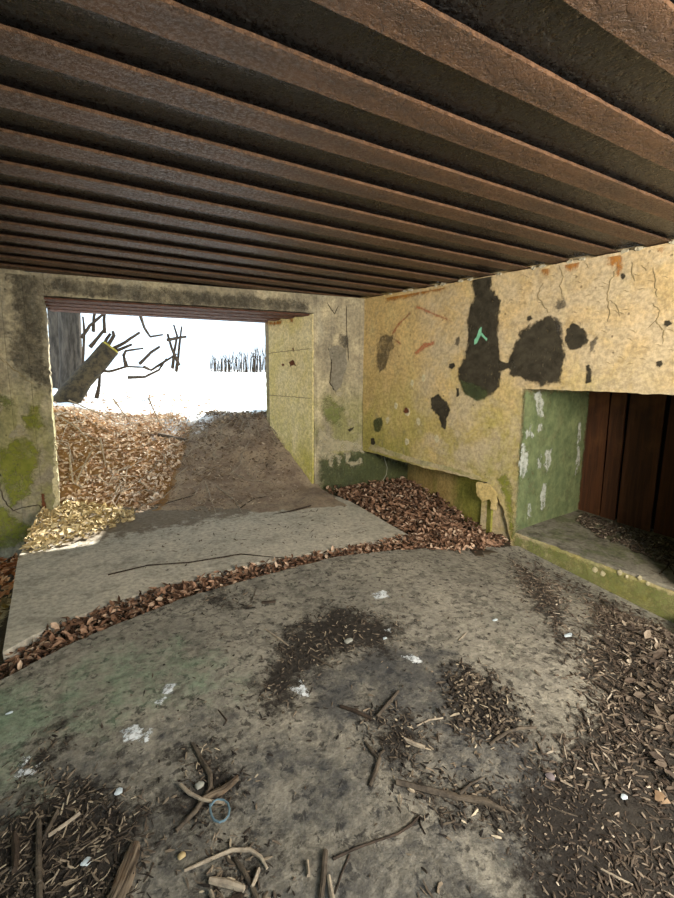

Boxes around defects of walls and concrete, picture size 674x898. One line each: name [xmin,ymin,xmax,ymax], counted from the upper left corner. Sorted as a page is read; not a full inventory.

rust [610,255,622,275]
crack [537,268,564,311]
crack [603,265,674,342]